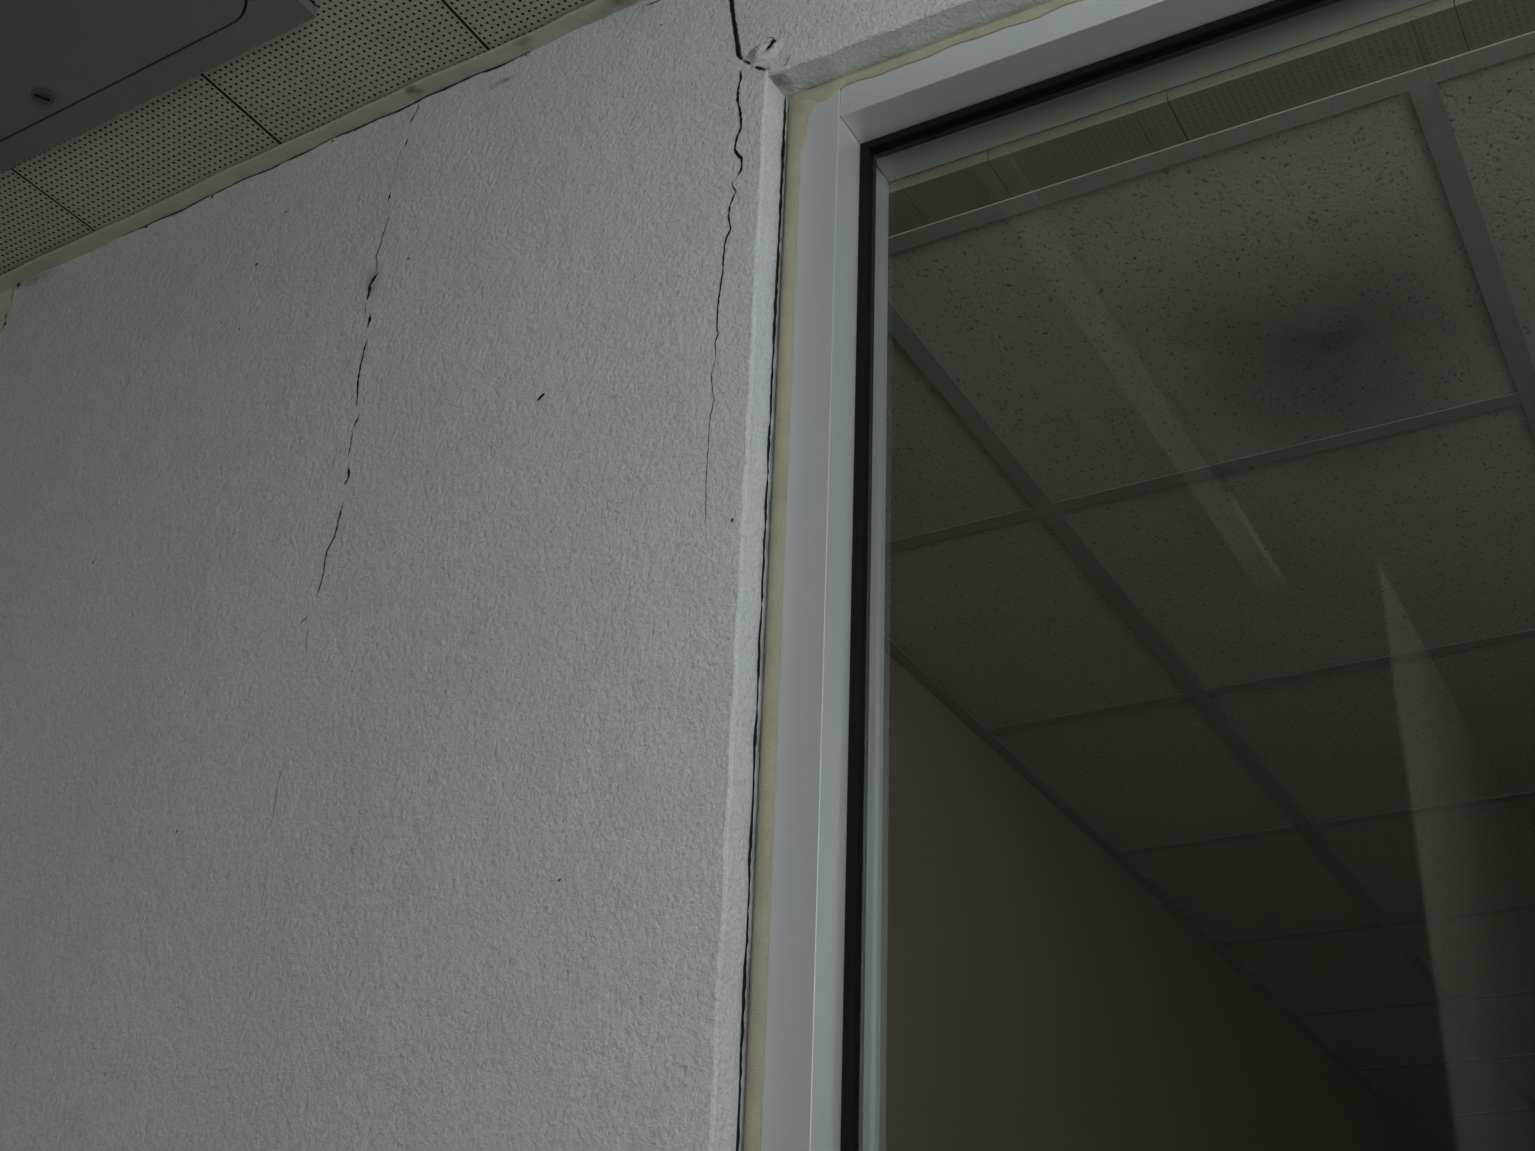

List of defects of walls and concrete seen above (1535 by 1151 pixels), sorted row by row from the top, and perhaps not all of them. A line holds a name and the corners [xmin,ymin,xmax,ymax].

crack [125,51,531,653]
crack [705,0,786,1151]